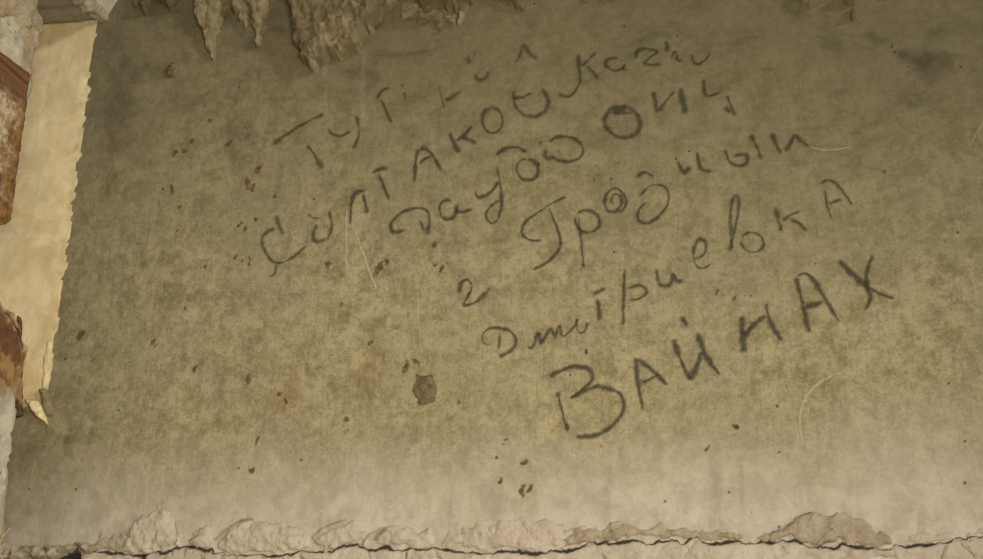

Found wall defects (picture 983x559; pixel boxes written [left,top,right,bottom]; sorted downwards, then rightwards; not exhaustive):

flaking render [194,0,274,62]
flaking render [287,0,474,73]
rust [0,303,28,418]
crack [83,536,983,559]